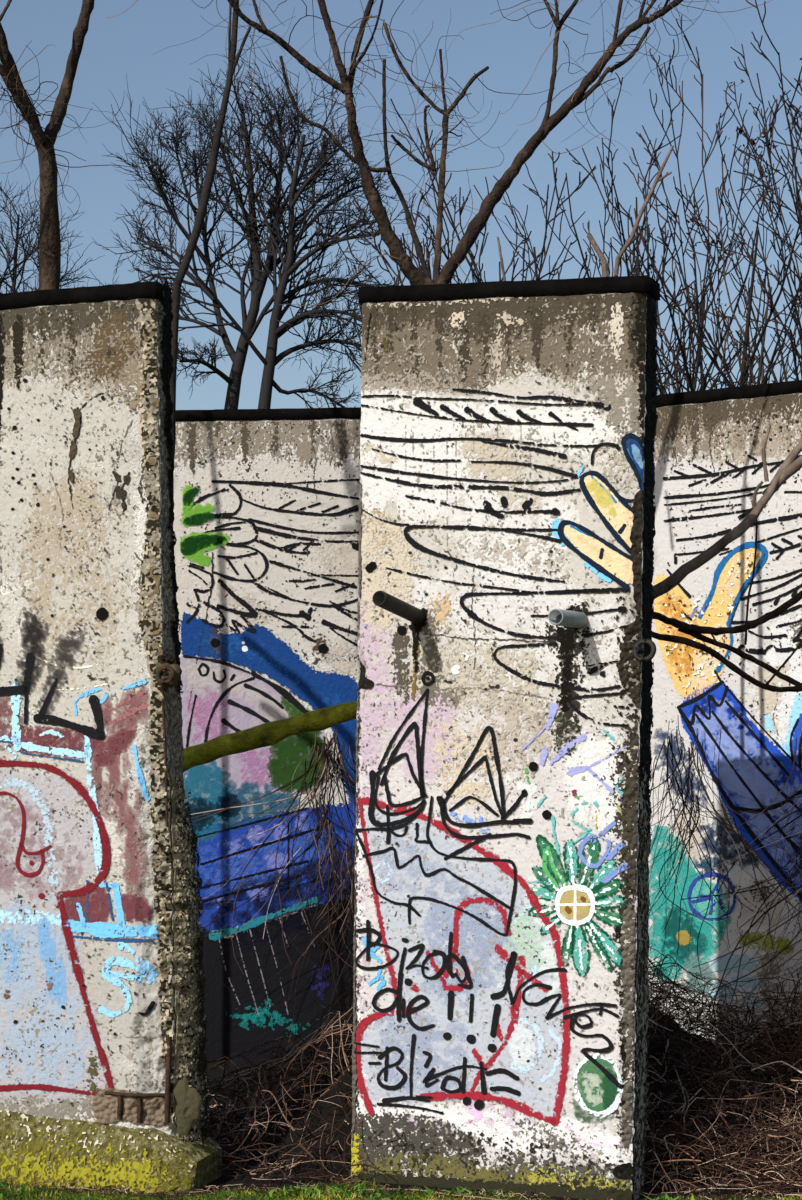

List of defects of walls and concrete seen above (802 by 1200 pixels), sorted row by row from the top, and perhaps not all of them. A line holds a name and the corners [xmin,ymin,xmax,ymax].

spalling [0,299,207,1141]
water stain [0,274,802,1200]
peeling [180,294,645,1194]
peeling [662,398,802,950]